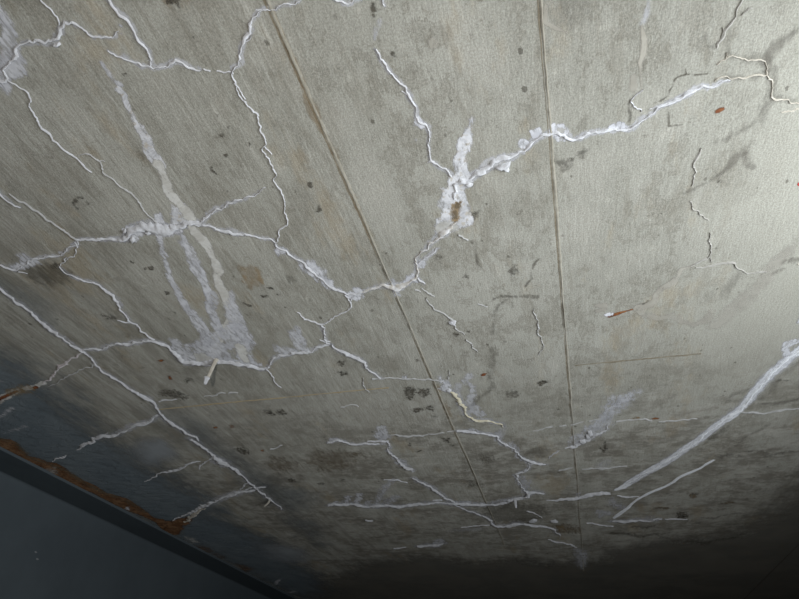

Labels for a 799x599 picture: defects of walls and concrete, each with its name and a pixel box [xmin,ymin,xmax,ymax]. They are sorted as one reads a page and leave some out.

water stain [101,62,262,366]
crack [0,0,799,388]
rust [0,353,82,404]
crack [0,267,282,523]
crack [332,344,503,427]
crack [534,418,697,431]
crack [740,407,799,415]
rust [0,439,168,530]
crack [327,425,577,549]
crack [558,464,627,472]
crack [586,518,688,527]